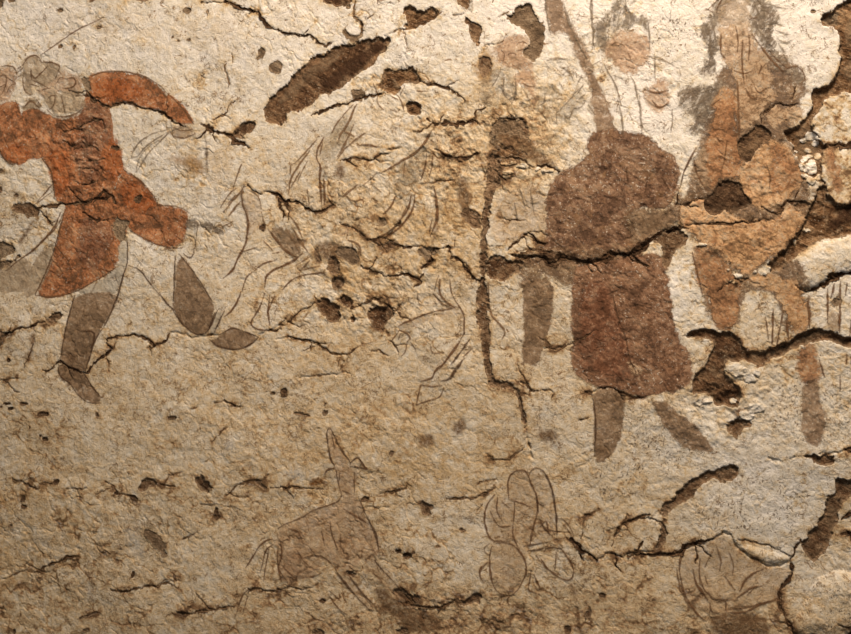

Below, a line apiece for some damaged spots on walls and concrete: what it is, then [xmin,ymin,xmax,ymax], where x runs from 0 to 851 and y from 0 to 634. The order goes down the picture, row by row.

crack [200,0,333,47]
spalling [506,3,545,62]
spalling [263,29,391,126]
crack [311,83,384,116]
crack [413,80,524,132]
flaking render [753,0,851,275]
crack [247,149,805,424]
crack [3,322,170,379]
flaking render [686,328,851,439]
crack [569,509,715,572]
spalling [655,464,739,550]
flaking render [801,478,851,562]